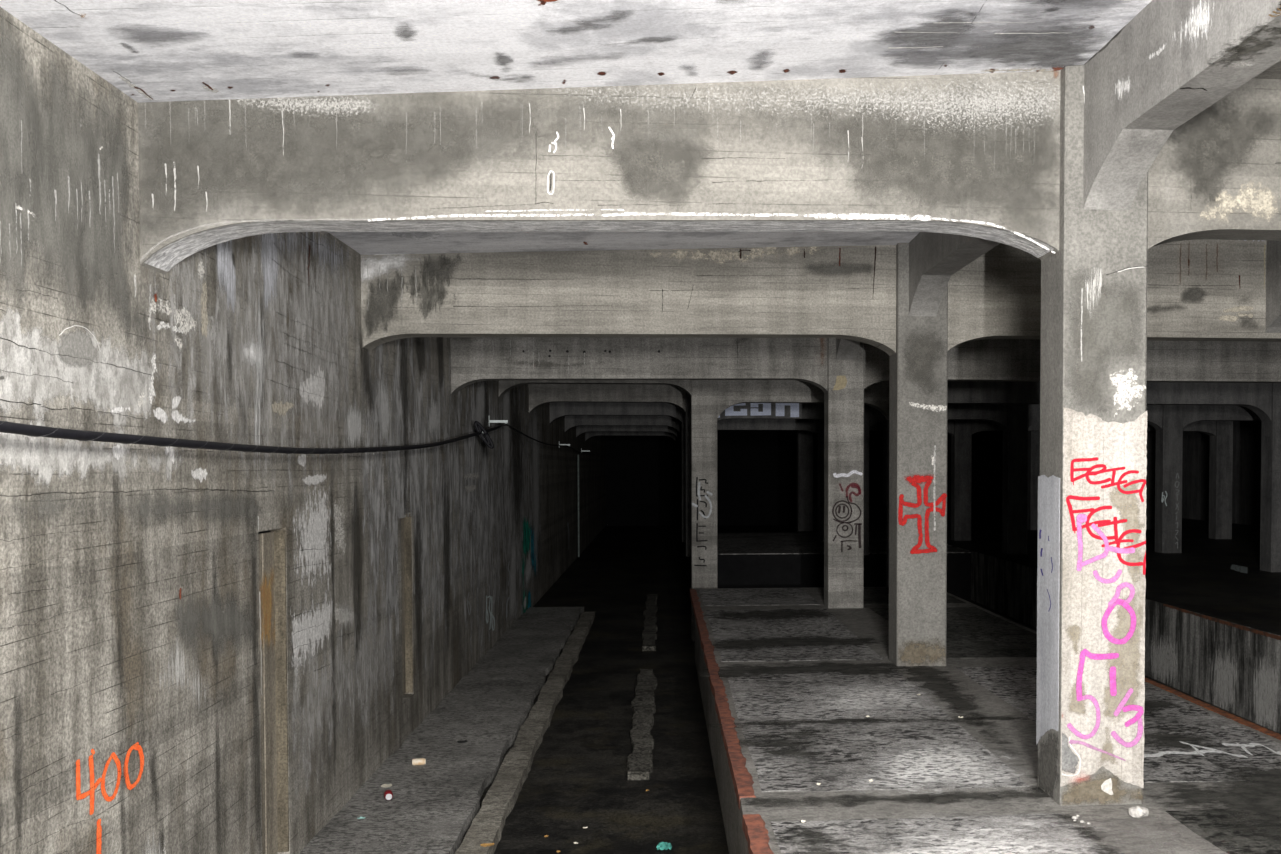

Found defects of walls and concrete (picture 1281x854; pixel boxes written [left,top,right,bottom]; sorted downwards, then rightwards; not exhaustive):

damp [887,0,1120,72]
damp [0,20,537,350]
damp [557,100,709,200]
damp [790,102,1047,211]
damp [1174,108,1277,219]
damp [138,353,157,417]
damp [229,232,343,481]
damp [1071,270,1204,417]
damp [347,253,543,675]
damp [178,556,262,846]